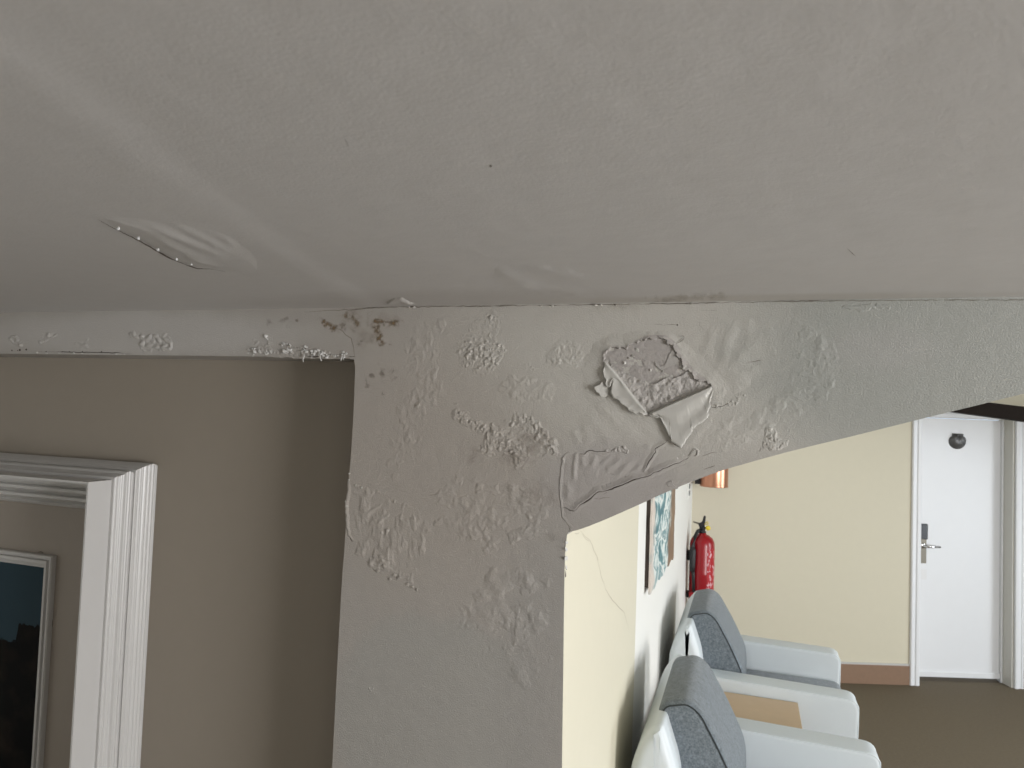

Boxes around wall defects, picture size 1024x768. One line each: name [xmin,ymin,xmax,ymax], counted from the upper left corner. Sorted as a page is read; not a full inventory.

peeling [247,335,355,362]
peeling [580,330,727,451]